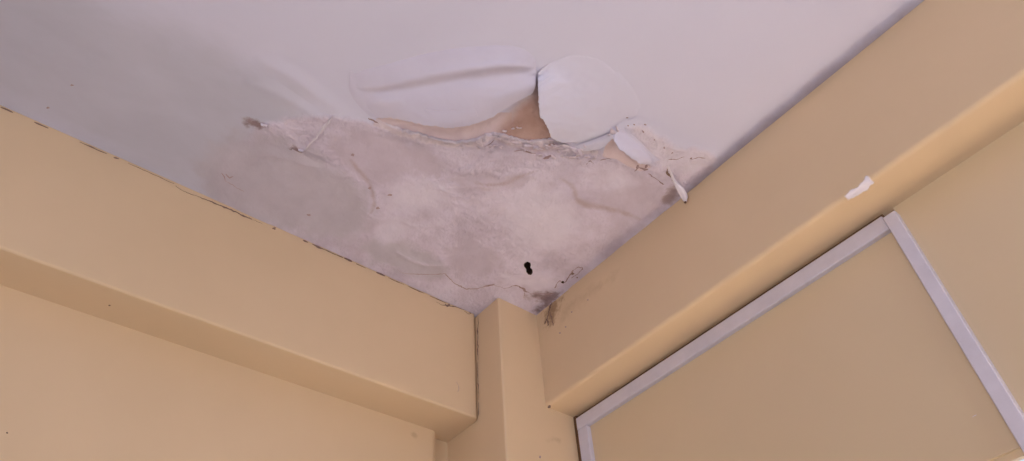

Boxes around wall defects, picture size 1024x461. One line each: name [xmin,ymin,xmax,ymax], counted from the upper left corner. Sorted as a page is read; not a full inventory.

peeling [233,107,332,136]
flaking render [347,107,650,174]
leakage [0,0,688,347]
crack [303,240,554,302]
flaking render [406,283,530,315]
flaking render [532,234,632,289]